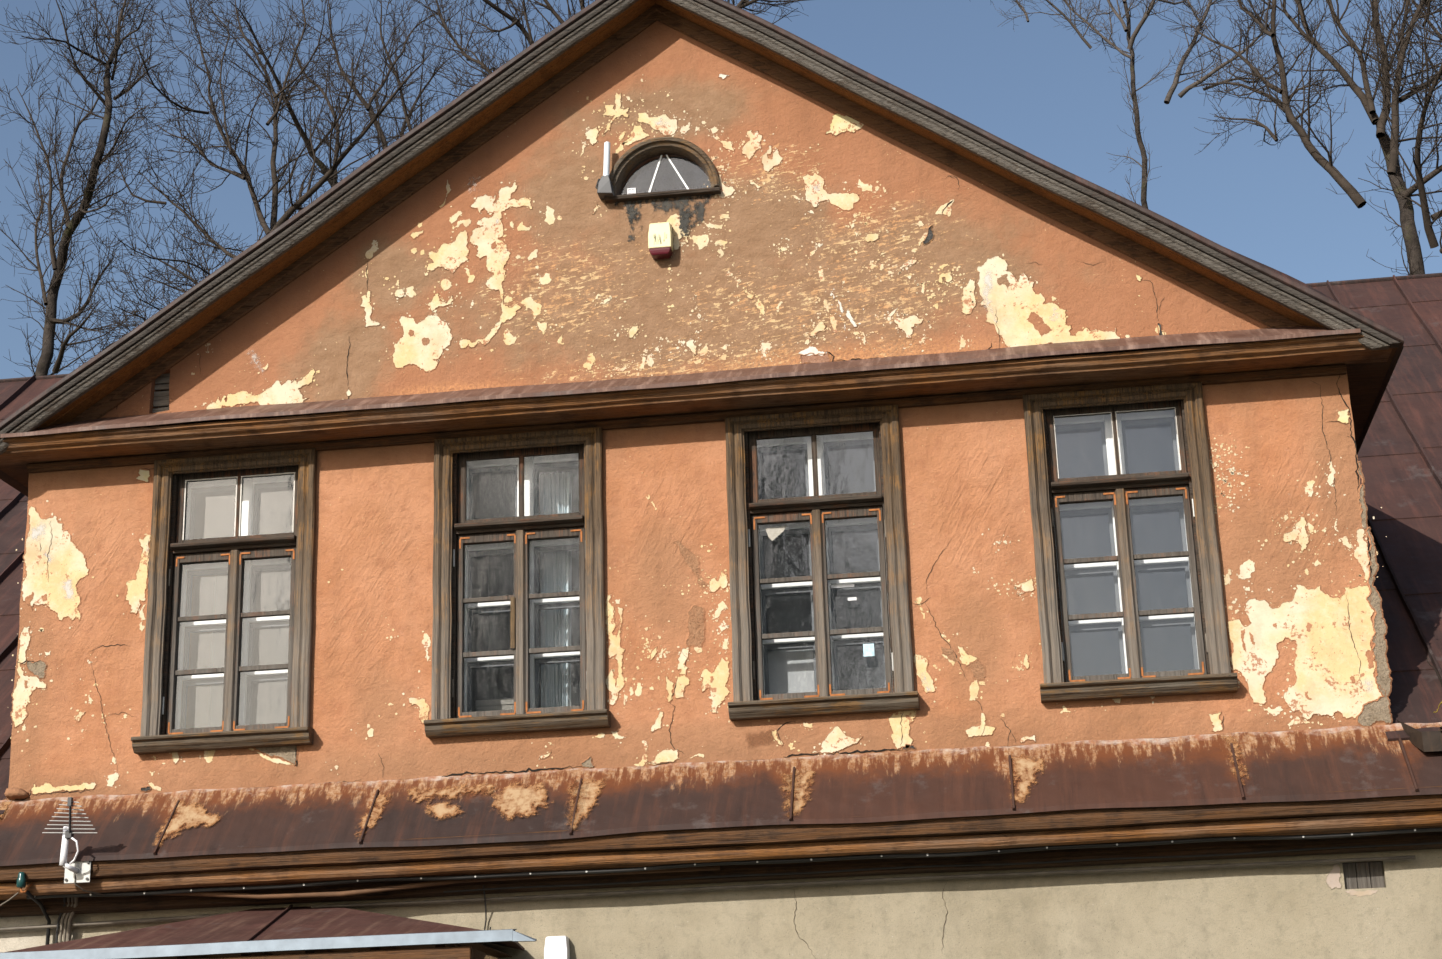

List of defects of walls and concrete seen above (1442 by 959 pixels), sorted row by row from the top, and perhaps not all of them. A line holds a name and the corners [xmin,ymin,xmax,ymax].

leakage [628,206,637,242]
leakage [680,212,692,236]
peeling [359,79,1130,377]
peeling [10,500,96,766]
peeling [116,533,151,631]
peeling [592,539,732,766]
crack [913,538,1016,741]
peeling [1223,457,1393,729]
corrosion [155,800,221,845]
corrosion [408,782,547,819]
corrosion [567,778,604,828]
corrosion [1010,755,1044,802]